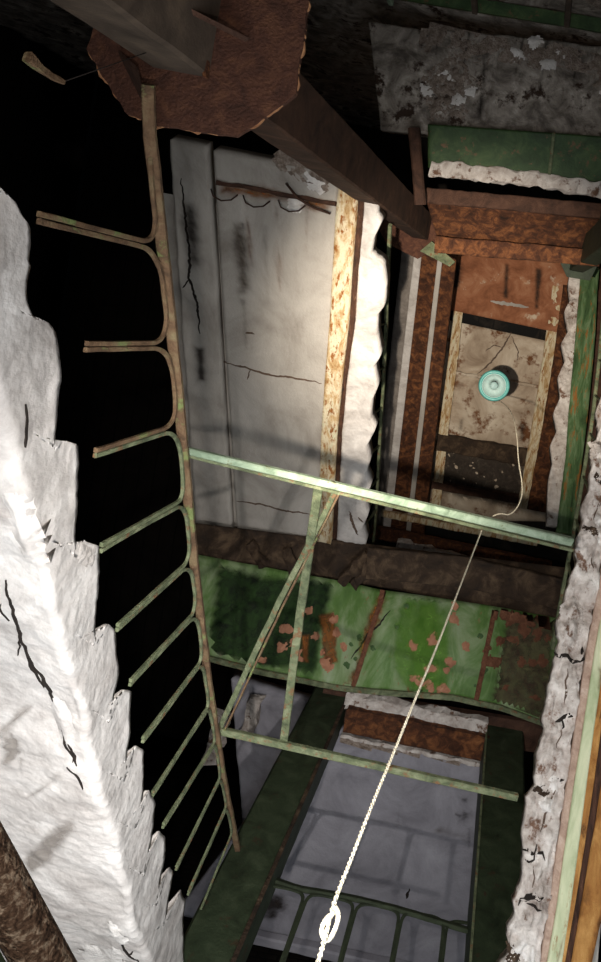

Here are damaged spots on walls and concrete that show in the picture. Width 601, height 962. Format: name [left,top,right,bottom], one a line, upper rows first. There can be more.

crack [180,178,200,333]
crack [224,361,322,384]
crack [0,580,54,702]
corrosion [320,613,337,664]
peeling [409,631,438,652]
peeling [409,657,456,693]
peeling [462,608,552,674]
corrosion [494,615,554,717]
crack [61,730,83,790]
flaking render [533,775,563,813]
flaking render [505,939,538,962]